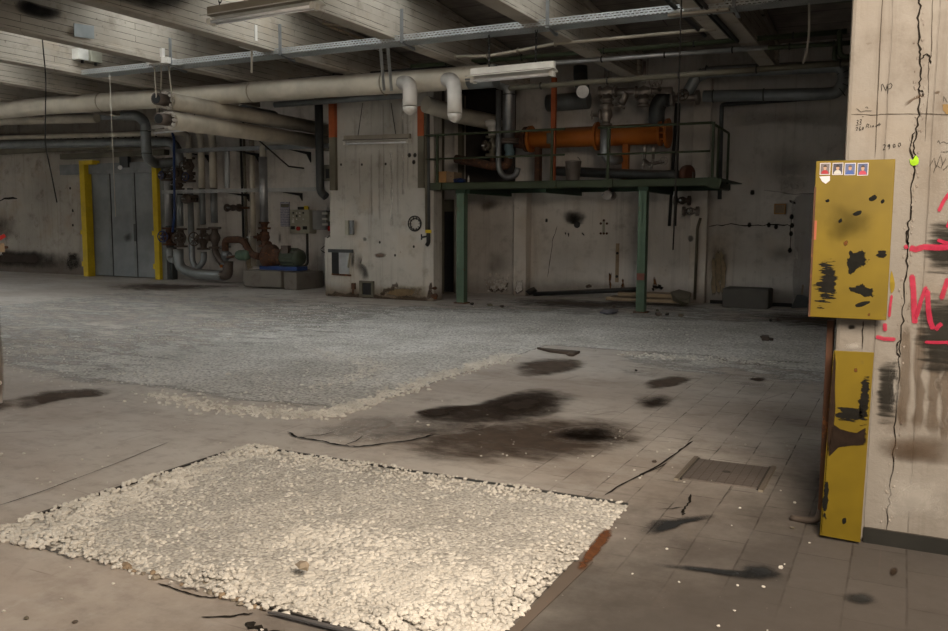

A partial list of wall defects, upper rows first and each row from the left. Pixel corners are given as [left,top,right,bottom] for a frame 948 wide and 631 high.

crack [851,0,948,530]
water stain [918,300,948,371]
water stain [878,366,919,421]
water stain [891,442,938,459]